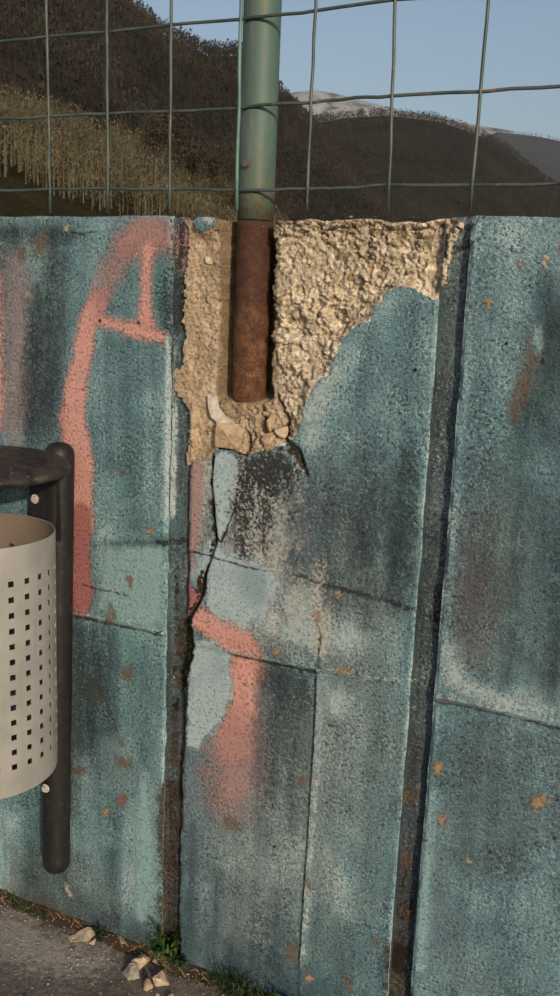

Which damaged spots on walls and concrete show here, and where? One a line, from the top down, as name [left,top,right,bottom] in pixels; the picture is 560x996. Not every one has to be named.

crack [155,456,272,629]
damp [225,446,335,664]
spalling [163,217,464,676]
crack [181,676,189,805]